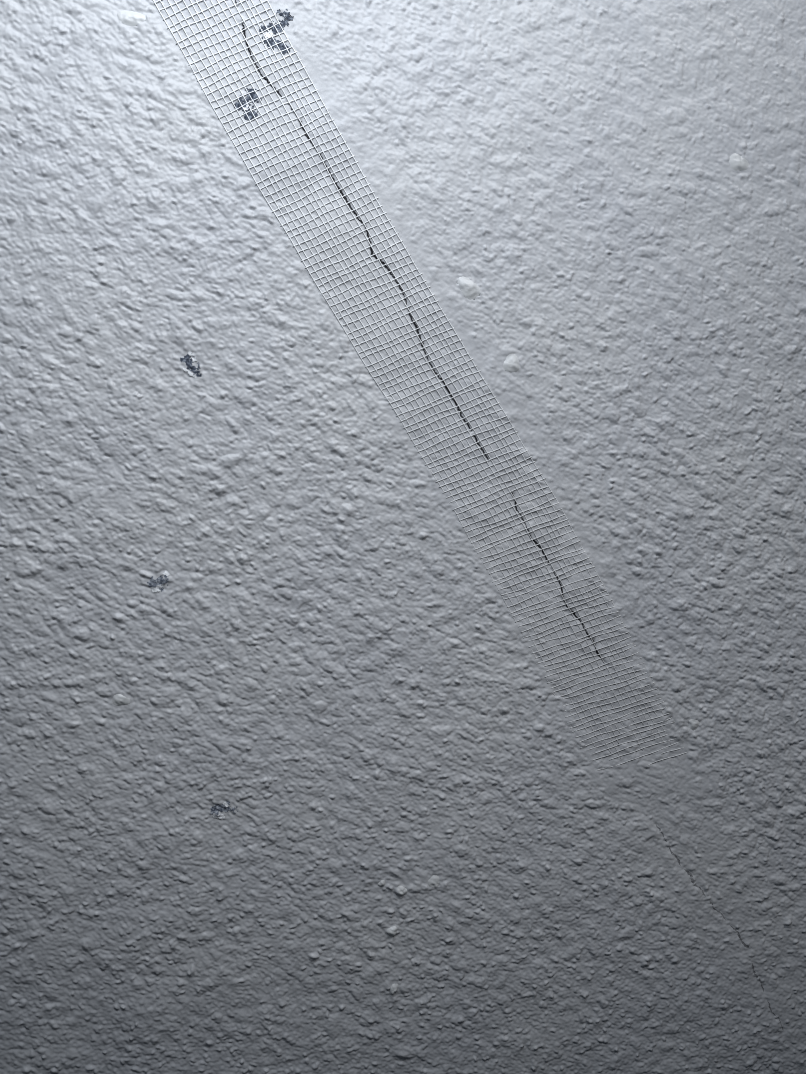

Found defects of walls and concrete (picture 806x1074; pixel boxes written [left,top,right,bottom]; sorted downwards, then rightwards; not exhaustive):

crack [235,0,489,460]
crack [512,493,601,658]